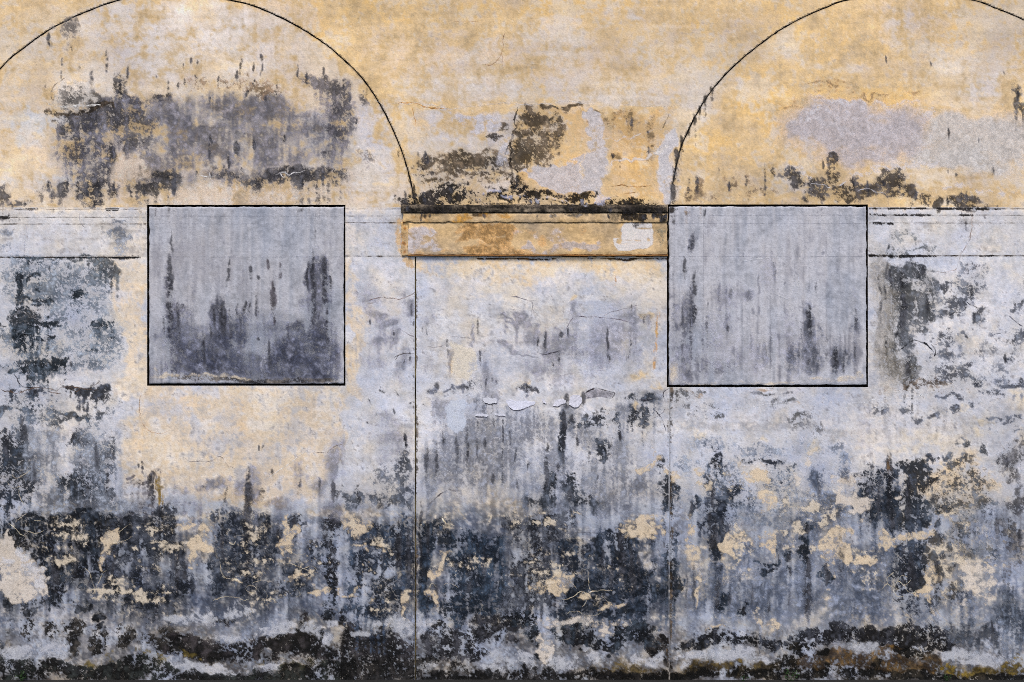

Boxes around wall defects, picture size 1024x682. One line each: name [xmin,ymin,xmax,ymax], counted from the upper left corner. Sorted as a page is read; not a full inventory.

leakage [0,59,357,211]
peeling [455,115,501,134]
peeling [523,108,678,205]
leakage [724,151,1024,425]
leakage [0,219,1024,669]
peeling [445,388,615,433]
peeling [0,530,76,604]
peeling [88,528,170,604]
peeling [685,525,700,560]
peeling [717,468,1004,614]